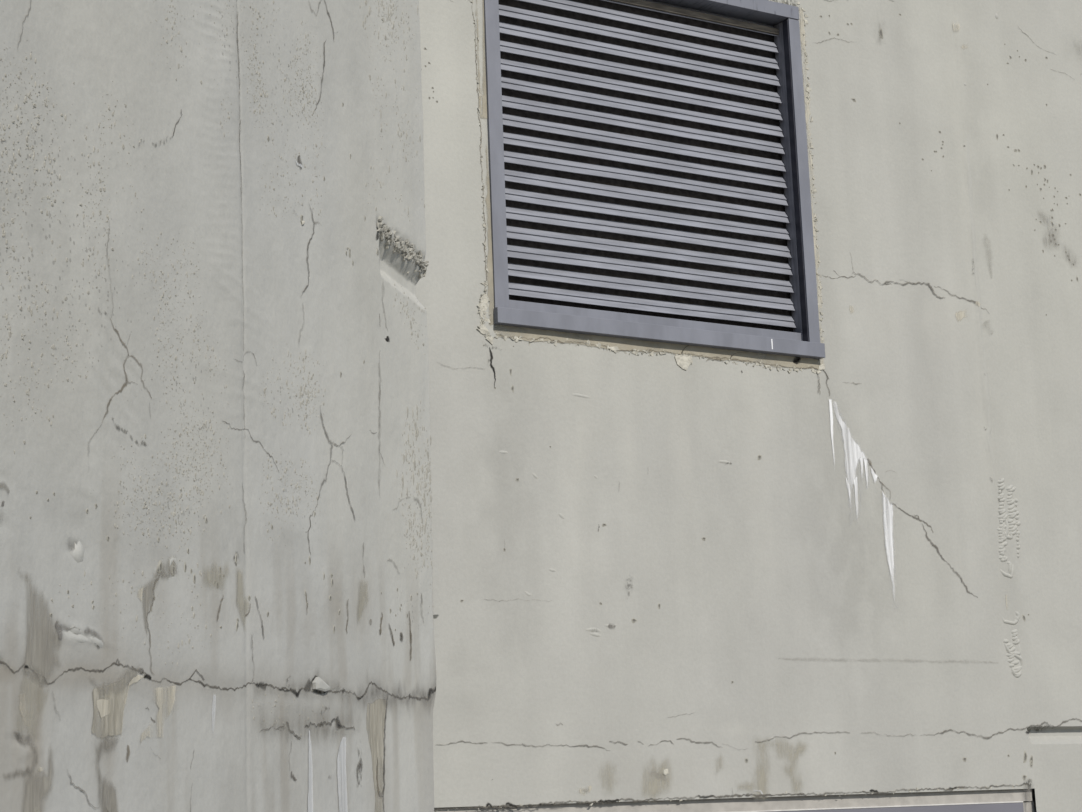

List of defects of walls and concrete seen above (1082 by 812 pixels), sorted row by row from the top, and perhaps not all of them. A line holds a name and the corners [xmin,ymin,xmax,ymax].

spalling [360,0,431,278]
spalling [470,0,830,379]
crack [830,270,983,309]
crack [105,312,151,446]
damp [829,399,878,512]
damp [883,493,894,583]
crack [868,459,972,594]
damp [14,736,52,812]
damp [99,776,117,812]
damp [92,670,143,753]
crack [0,596,436,809]
crack [937,718,1081,739]